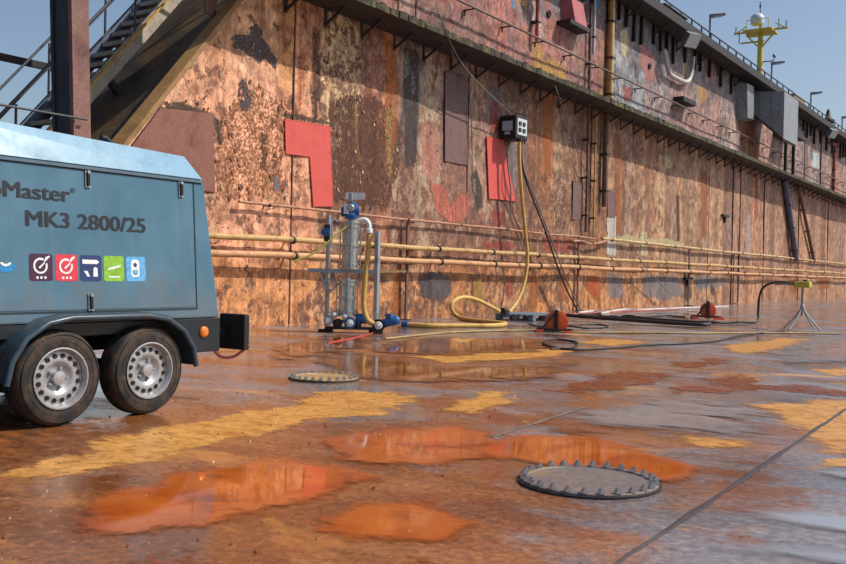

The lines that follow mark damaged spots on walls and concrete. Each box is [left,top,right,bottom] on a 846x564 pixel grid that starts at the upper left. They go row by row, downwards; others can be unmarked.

rust [529,0,544,38]
spalling [228,24,278,69]
peeling [214,78,296,202]
rust [328,41,402,212]
rust [736,114,760,160]
rust [614,133,624,234]
rust [585,274,601,307]